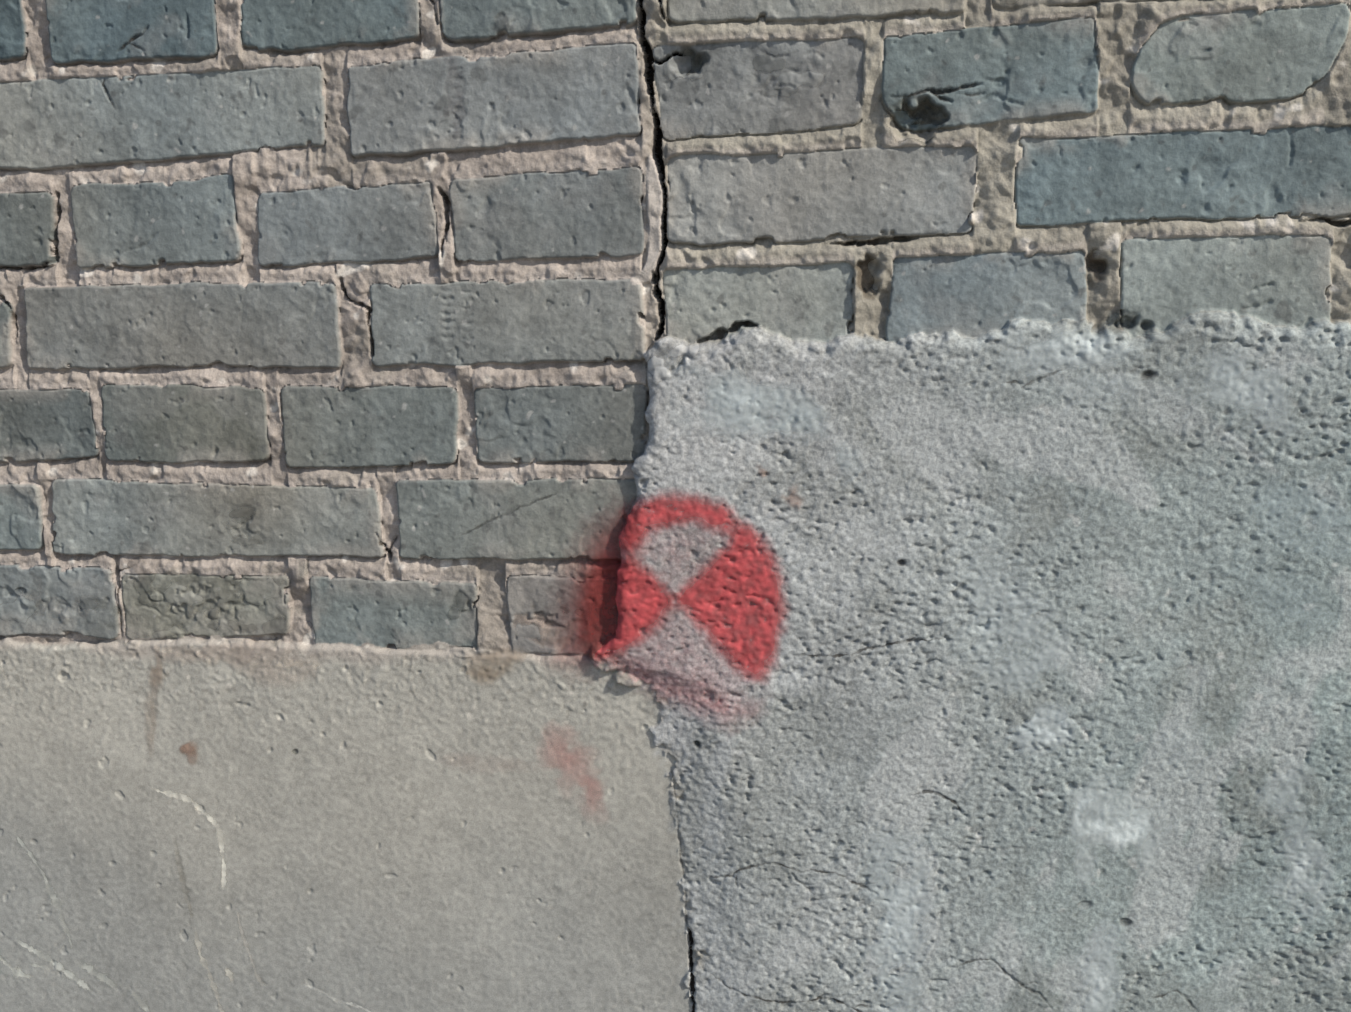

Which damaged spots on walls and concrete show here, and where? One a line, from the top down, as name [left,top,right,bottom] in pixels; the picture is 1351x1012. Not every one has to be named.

crack [639,0,683,335]
crack [343,288,372,333]
crack [809,639,927,657]
crack [726,864,871,891]
crack [688,930,696,1012]
crack [727,986,865,1012]